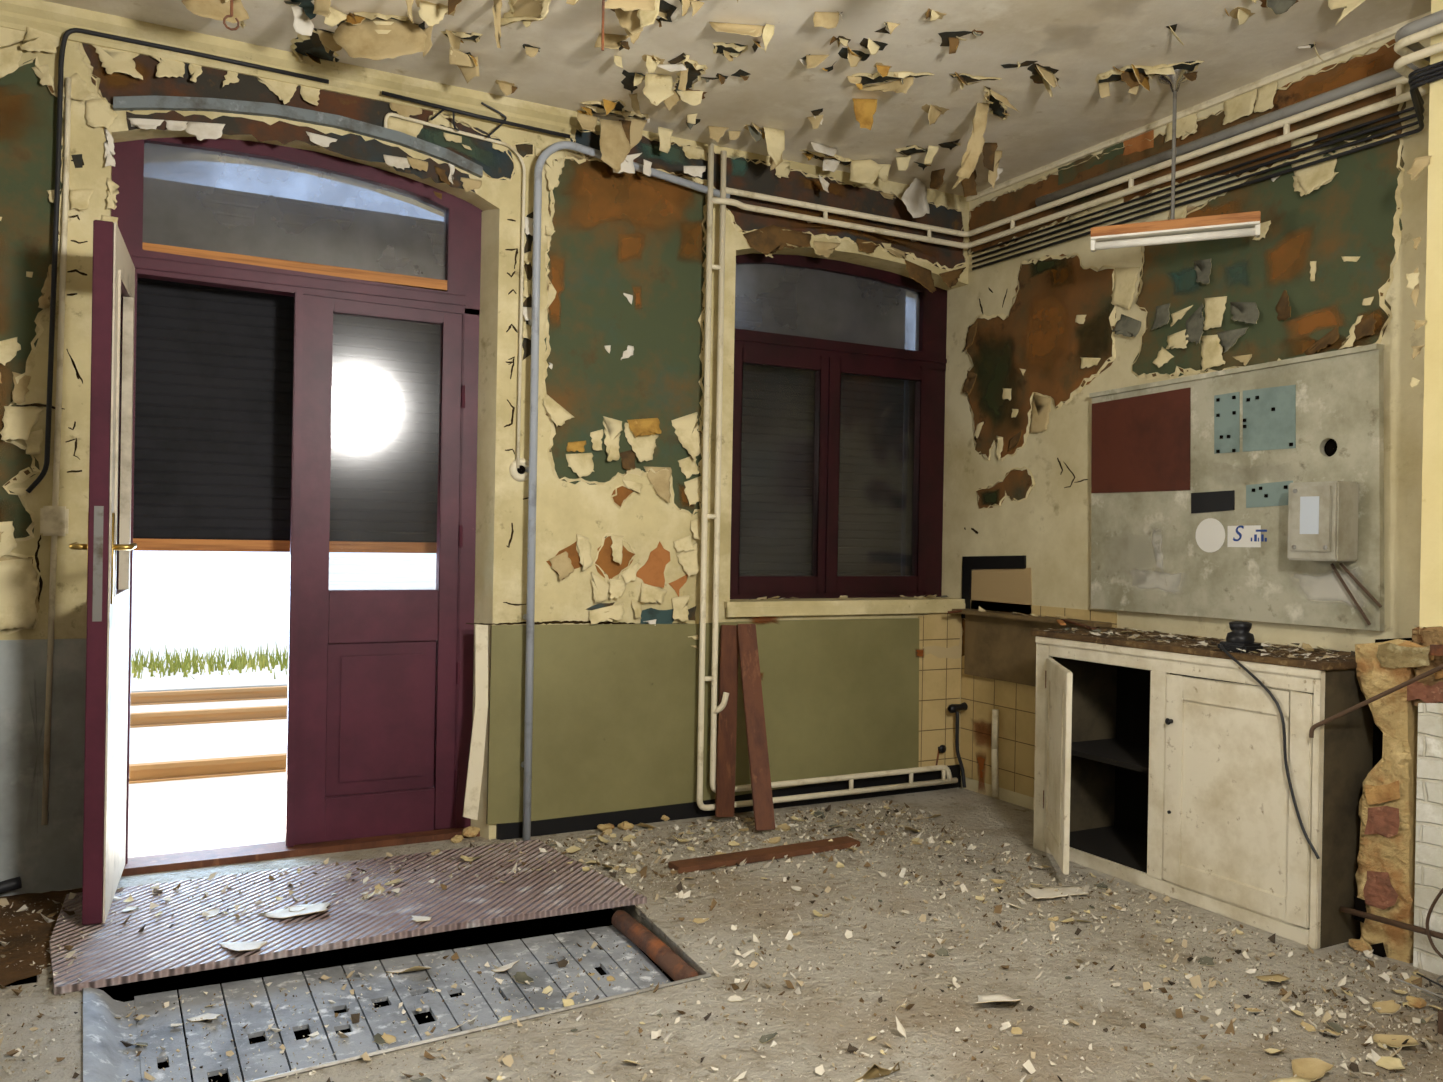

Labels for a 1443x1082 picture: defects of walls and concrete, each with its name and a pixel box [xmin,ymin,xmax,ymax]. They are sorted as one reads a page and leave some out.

peeling [0,0,1432,649]
flaking render [1354,626,1443,1024]
peeling [1361,1034,1419,1075]